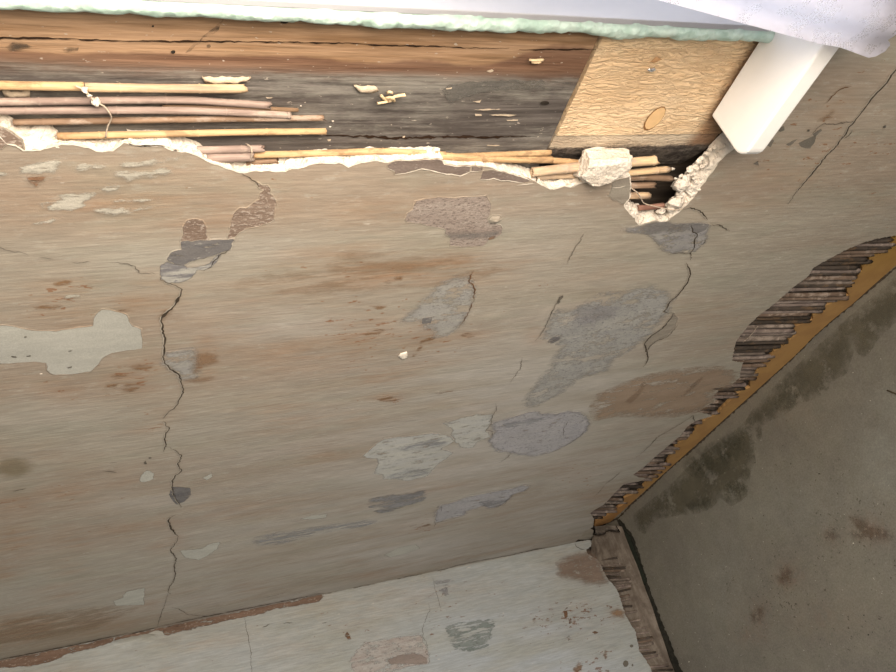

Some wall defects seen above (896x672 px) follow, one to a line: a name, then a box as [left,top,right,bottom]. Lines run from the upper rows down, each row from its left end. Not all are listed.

peeling [0,115,585,283]
peeling [607,132,734,254]
peeling [786,129,822,148]
crack [788,70,896,203]
crack [0,262,585,669]
peeling [403,277,473,337]
peeling [443,414,493,448]
peeling [526,286,679,406]
water stain [591,368,733,419]
crack [642,207,727,367]
peeling [349,634,430,672]